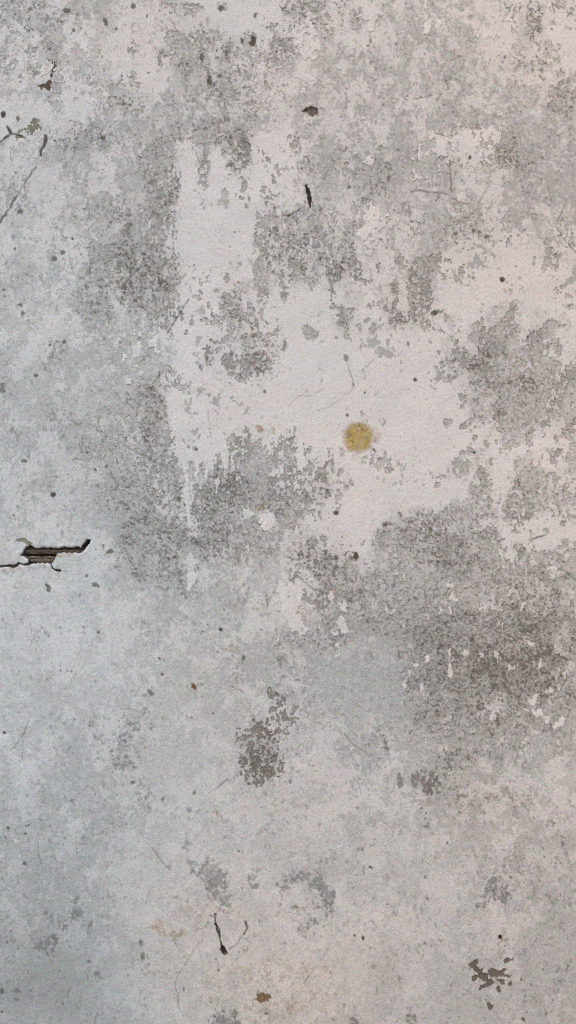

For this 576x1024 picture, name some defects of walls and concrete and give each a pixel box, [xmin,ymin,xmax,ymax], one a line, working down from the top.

rust [346,423,372,451]
crack [0,562,61,572]
crack [215,914,247,952]
peeling [468,945,522,1011]